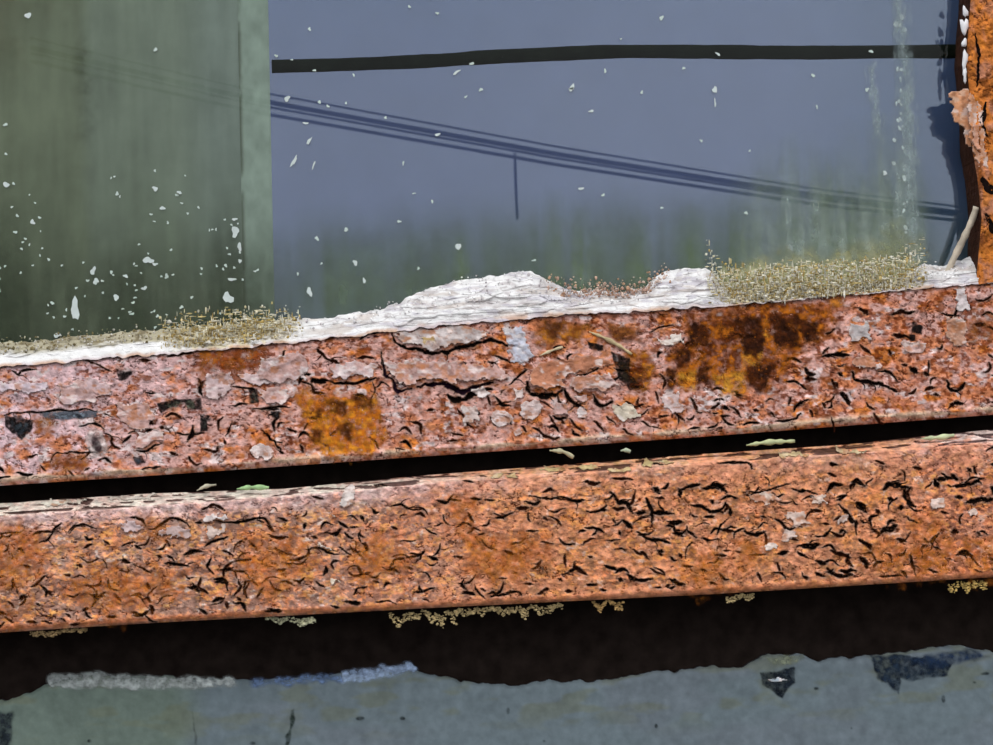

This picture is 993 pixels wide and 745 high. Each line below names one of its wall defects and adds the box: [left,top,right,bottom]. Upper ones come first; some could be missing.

peeling [948,89,988,168]
rust [199,343,273,381]
rust [297,388,387,458]
leakage [324,254,447,317]
crack [0,309,993,479]
rust [534,321,586,348]
leakage [574,249,644,292]
rust [609,292,843,394]
leakage [714,225,916,293]
crack [941,295,993,330]
crack [0,447,993,628]
leakage [0,713,13,745]